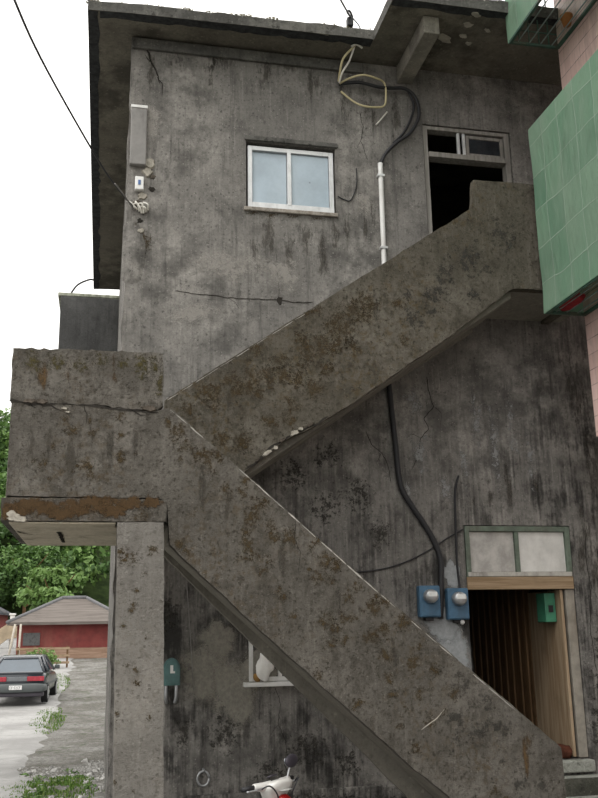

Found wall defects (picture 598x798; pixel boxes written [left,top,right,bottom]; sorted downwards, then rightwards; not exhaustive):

spalling [438,12,481,46]
crack [144,50,163,94]
crack [9,398,157,425]
damp [310,477,373,524]